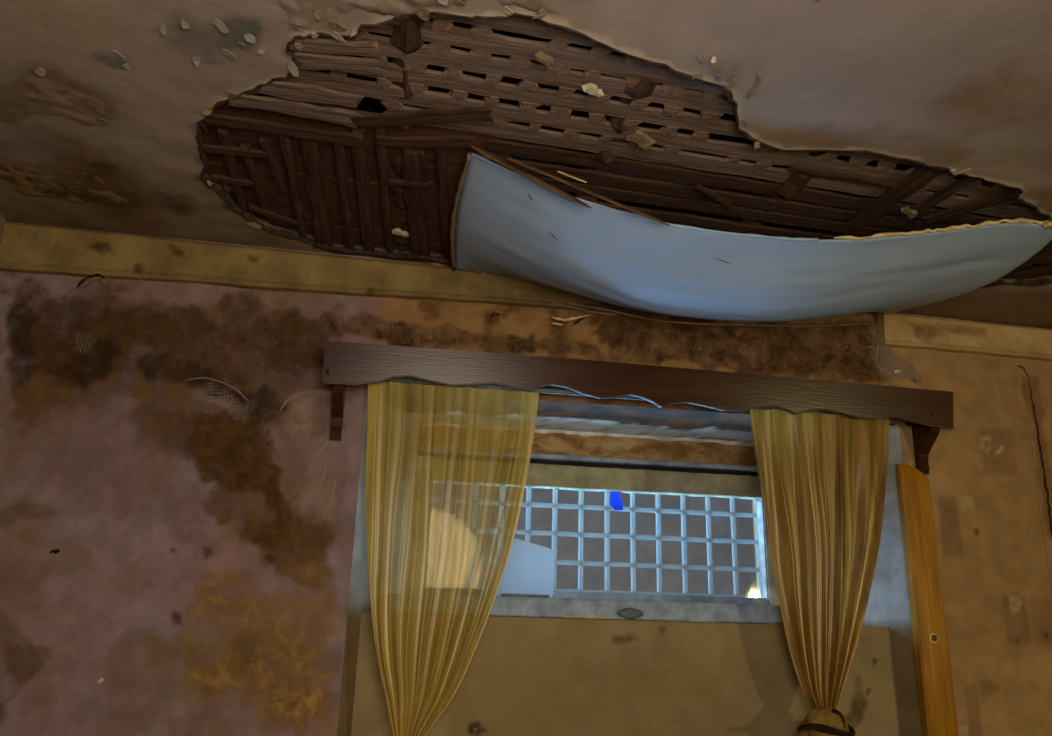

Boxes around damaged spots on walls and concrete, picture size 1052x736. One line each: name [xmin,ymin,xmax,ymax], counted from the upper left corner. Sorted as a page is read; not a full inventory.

flaking render [196,0,1052,264]
flaking render [978,278,1052,289]
water stain [8,280,601,730]
crack [1018,365,1052,590]